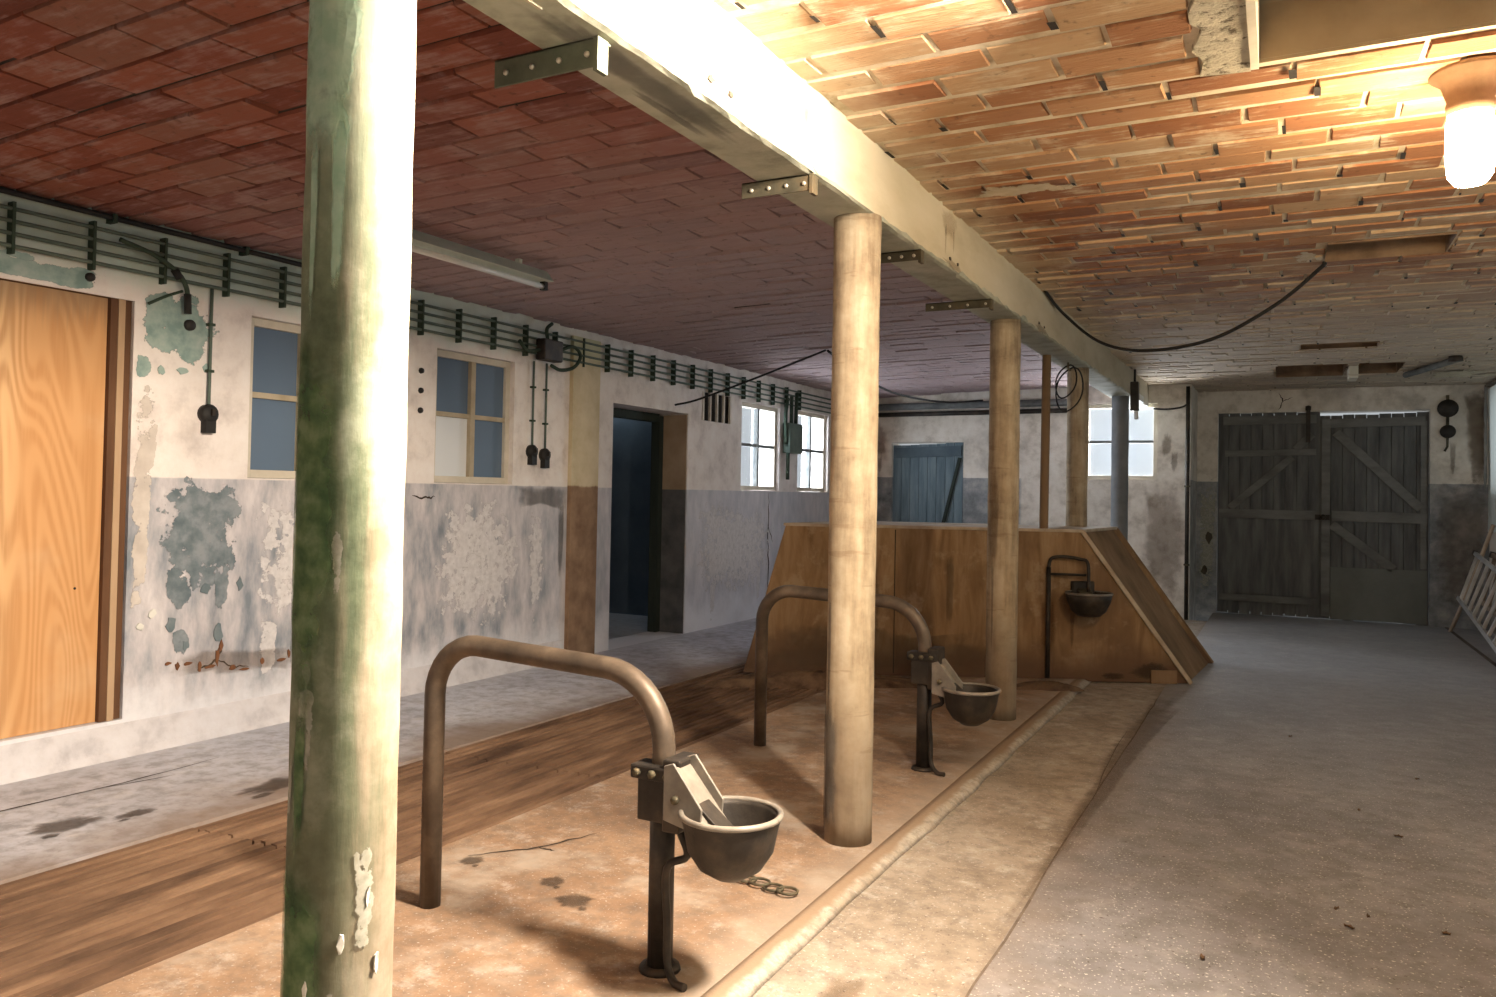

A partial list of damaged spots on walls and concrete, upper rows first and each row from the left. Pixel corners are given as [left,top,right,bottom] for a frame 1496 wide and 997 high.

peeling [130,292,291,672]
peeling [336,847,379,974]